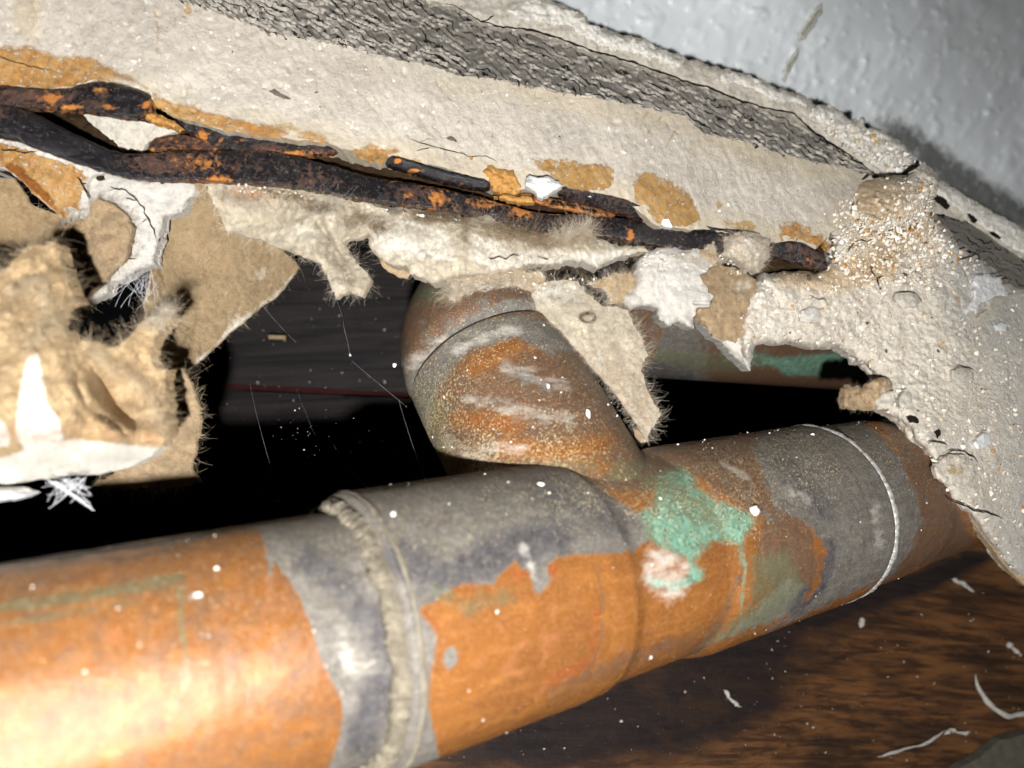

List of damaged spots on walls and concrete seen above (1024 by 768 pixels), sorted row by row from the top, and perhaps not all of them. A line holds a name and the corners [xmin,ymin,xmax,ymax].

corrosion [146,99,325,144]
corrosion [0,143,86,218]
corrosion [483,164,534,206]
peeling [520,175,615,218]
corrosion [535,159,613,191]
corrosion [633,173,700,227]
peeling [692,226,760,235]
corrosion [780,223,829,253]
peeling [380,259,411,280]
flaking render [874,389,919,423]
crack [927,430,987,464]
crack [943,495,1004,520]